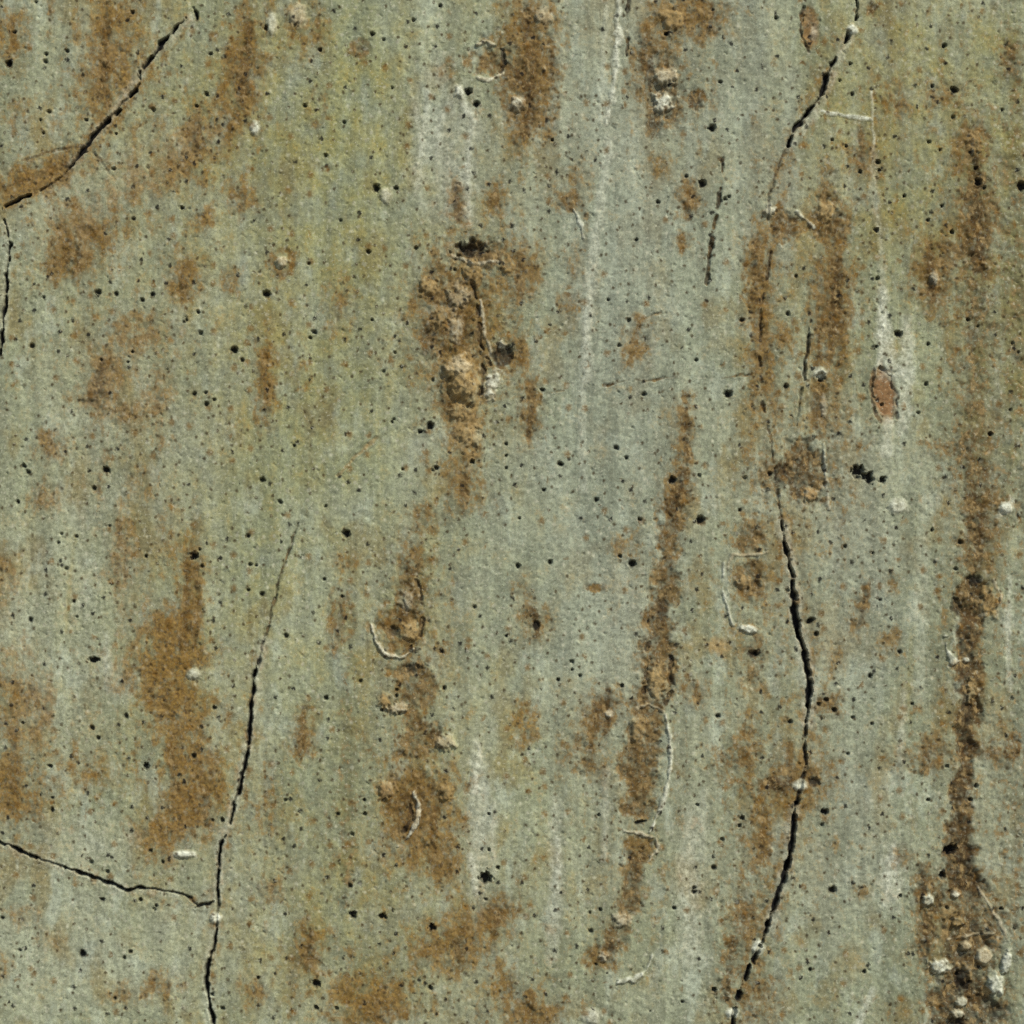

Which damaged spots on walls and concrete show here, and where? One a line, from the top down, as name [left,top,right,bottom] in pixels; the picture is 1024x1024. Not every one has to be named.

crack [0,6,200,356]
corrosion [0,0,603,1024]
peeling [400,215,521,475]
corrosion [648,358,706,522]
corrosion [613,0,763,124]
crack [703,157,726,292]
corrosion [735,189,866,438]
crack [766,0,859,223]
spalling [867,357,901,428]
corrosion [901,401,1021,592]
crack [720,250,814,1024]
crack [0,521,299,1024]